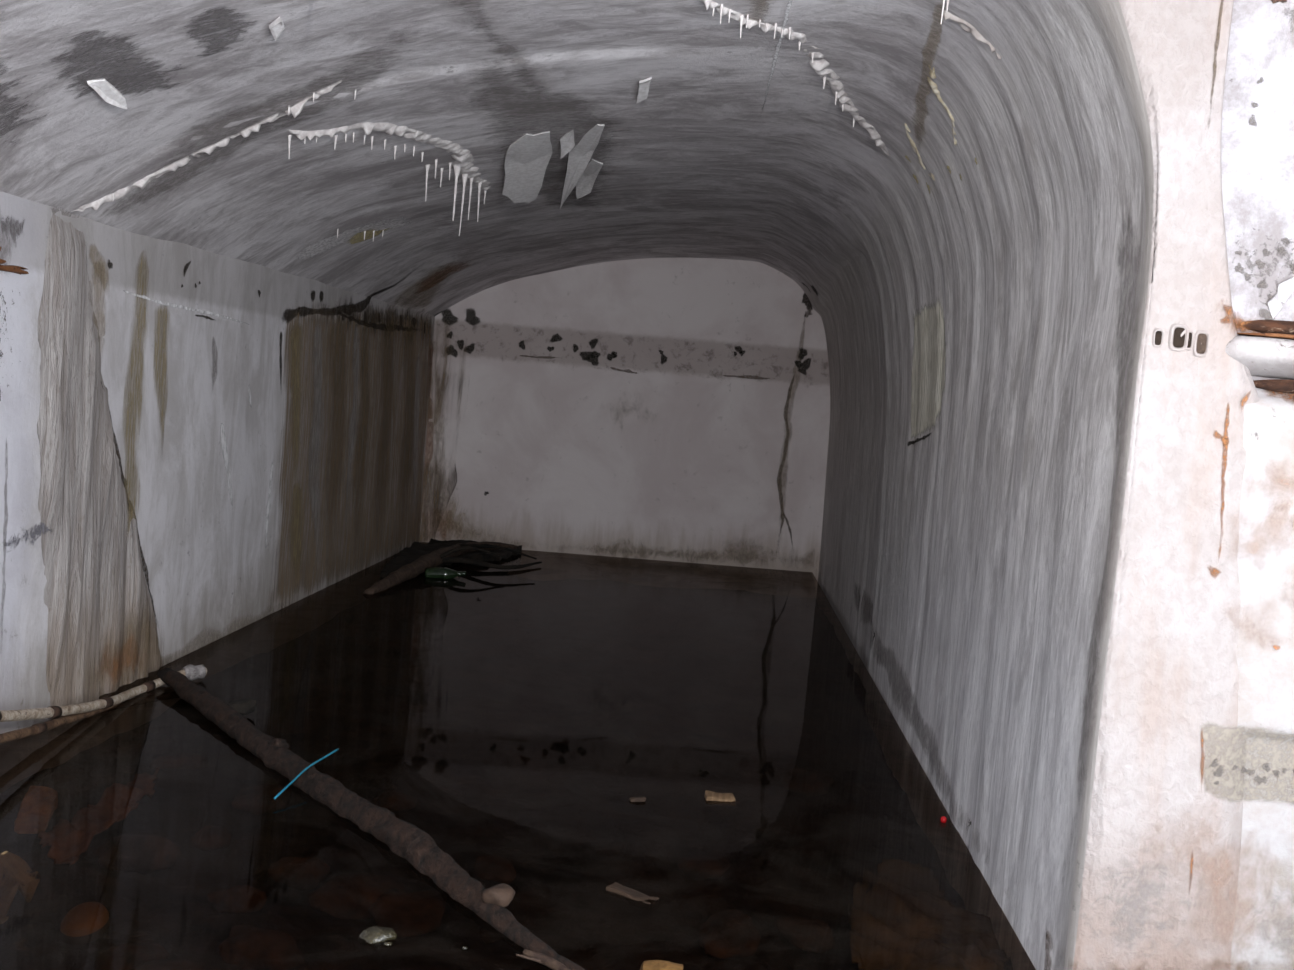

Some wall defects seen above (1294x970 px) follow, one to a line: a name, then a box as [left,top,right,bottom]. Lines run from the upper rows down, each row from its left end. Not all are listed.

peeling [636,77,652,104]
efflorescence [700,0,889,156]
efflorescence [940,0,1002,59]
efflorescence [71,80,491,236]
peeling [502,124,604,209]
peeling [1232,228,1294,320]
mould [519,333,637,374]
mould [795,348,811,375]
crack [101,382,156,616]
water stain [266,291,480,606]
crack [777,377,794,539]
corrosion [1214,392,1250,525]